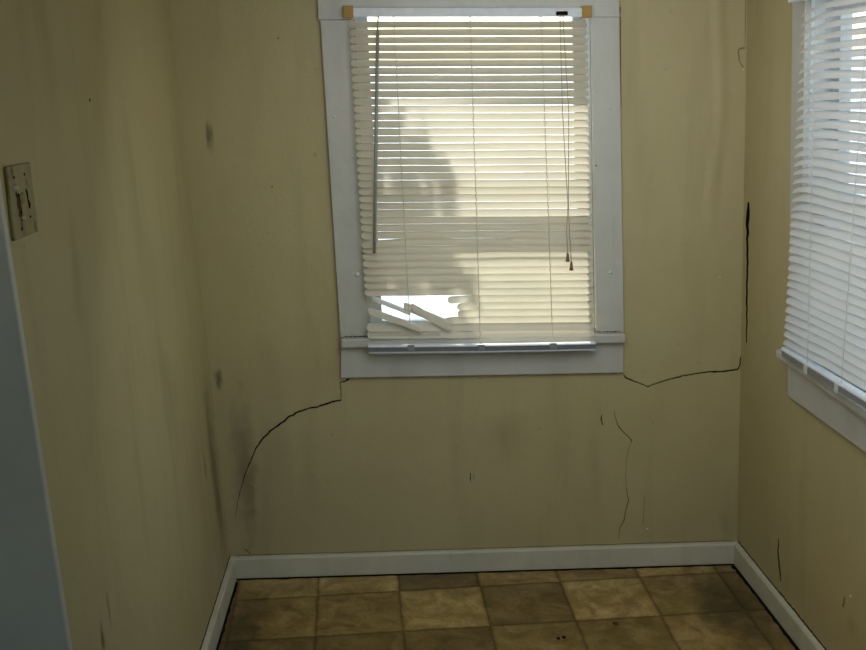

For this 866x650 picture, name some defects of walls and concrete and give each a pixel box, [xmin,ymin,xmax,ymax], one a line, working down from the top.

crack [624,202,750,387]
crack [235,379,349,517]